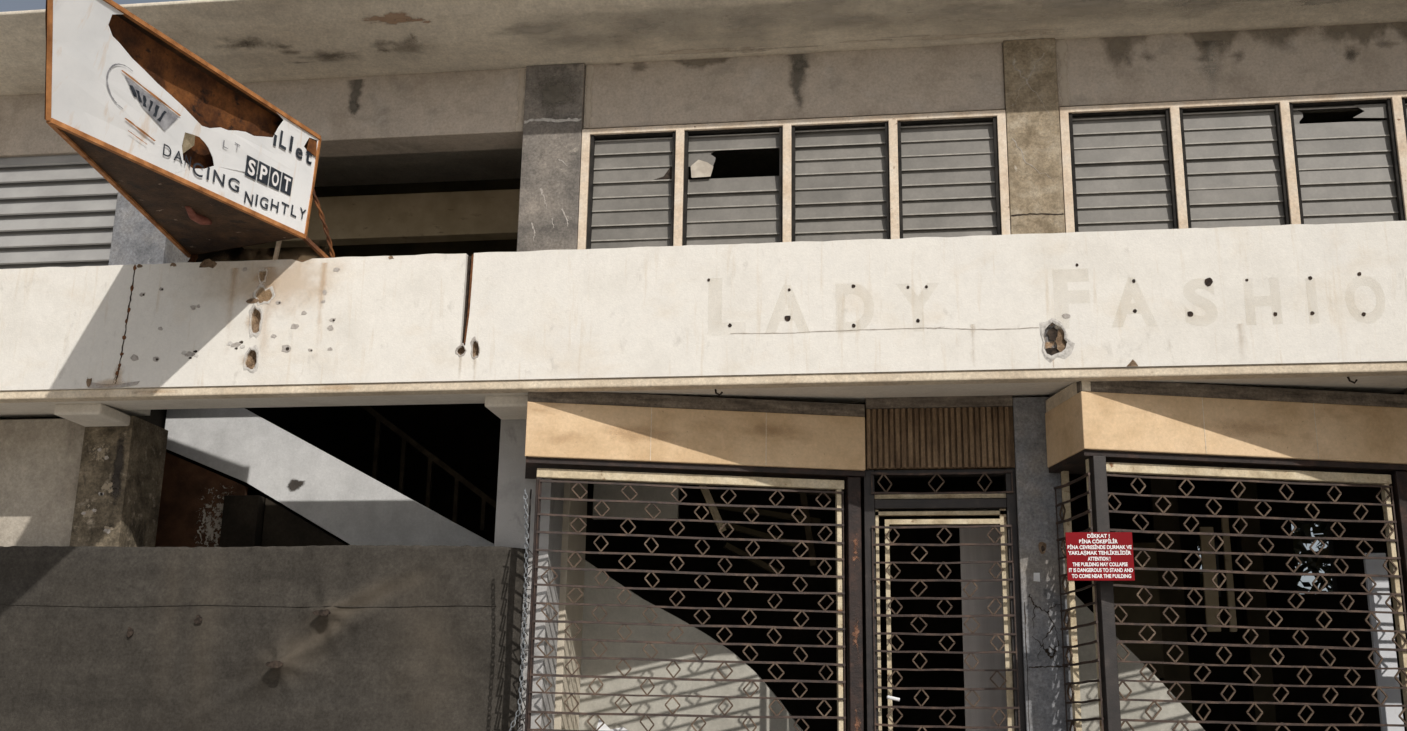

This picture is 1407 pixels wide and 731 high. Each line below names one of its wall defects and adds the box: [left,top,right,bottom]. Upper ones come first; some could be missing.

water stain [788,46,810,102]
water stain [1104,35,1146,63]
water stain [1190,27,1299,74]
water stain [1327,22,1407,57]
crack [113,265,137,384]
spalling [226,267,307,373]
crack [455,254,480,360]
spalling [1039,313,1075,363]
peeling [81,482,114,534]